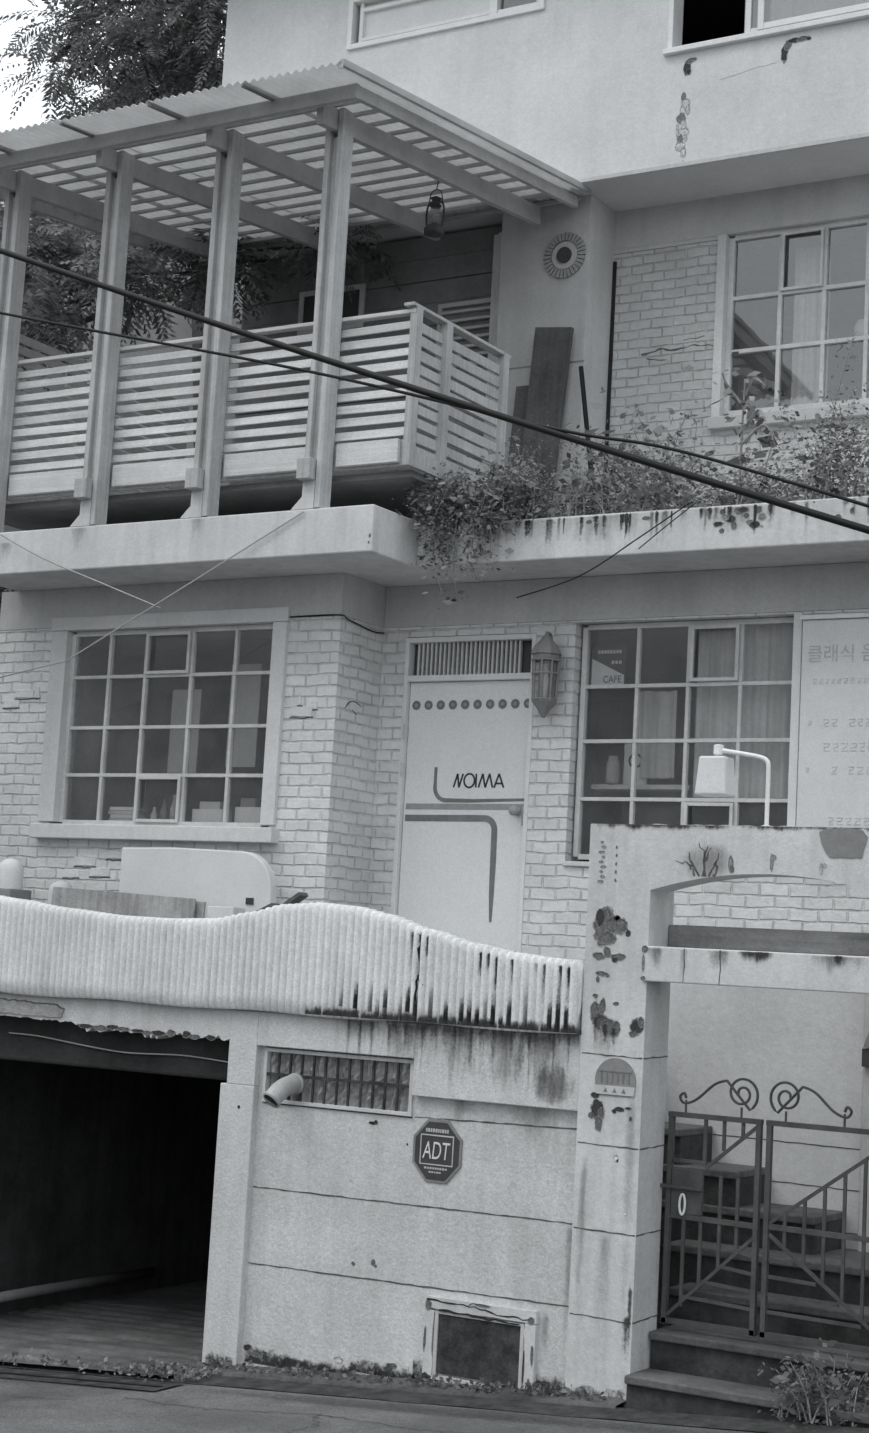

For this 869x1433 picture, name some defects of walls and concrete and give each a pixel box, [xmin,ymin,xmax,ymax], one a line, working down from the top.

peeling [675,57,697,157]
damp [506,513,631,534]
damp [651,504,773,530]
peeling [590,907,648,1037]
spalling [78,1024,216,1041]
damp [305,988,615,1098]
peeling [588,1092,632,1131]